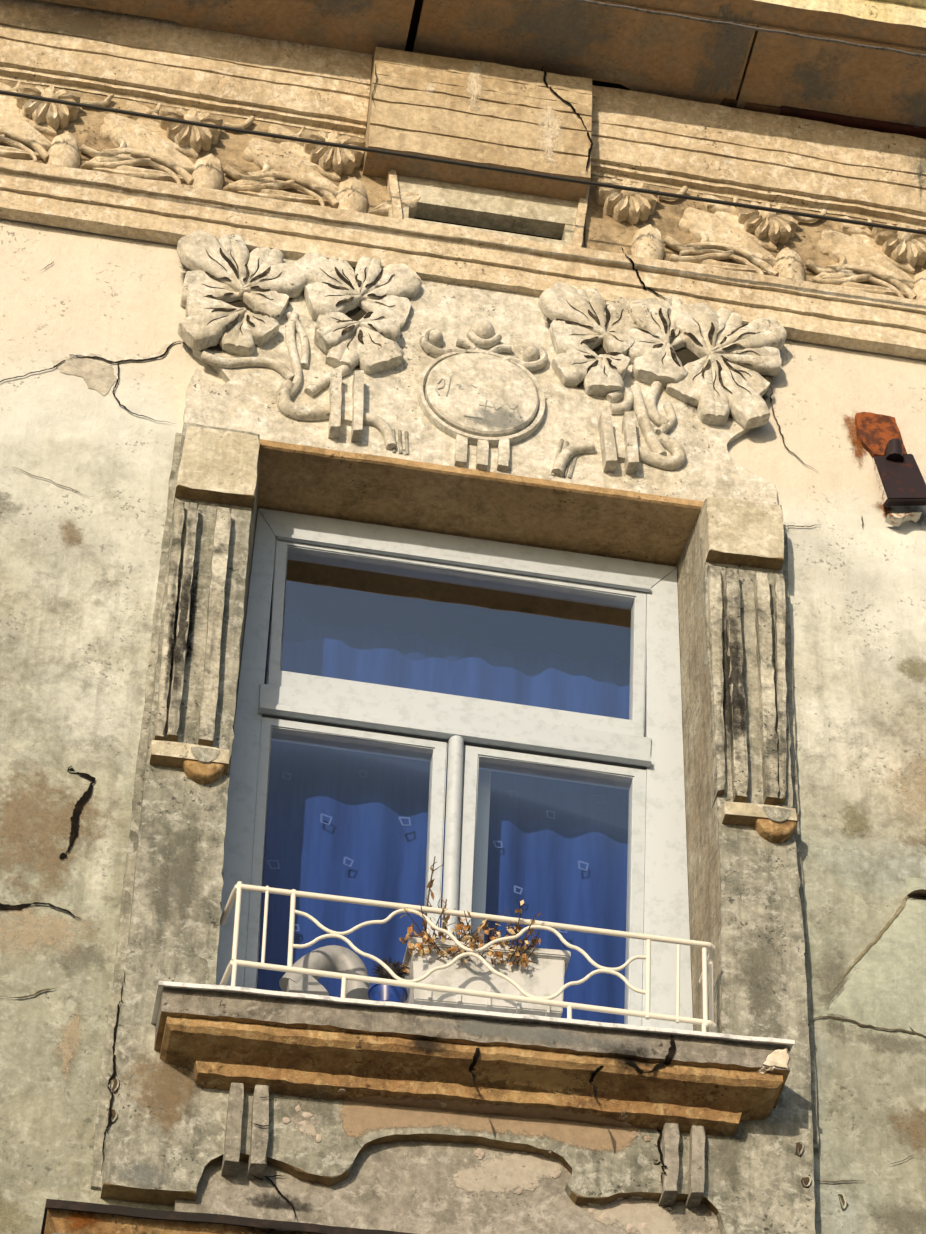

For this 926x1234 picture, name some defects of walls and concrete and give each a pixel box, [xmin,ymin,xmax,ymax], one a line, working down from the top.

crack [541,66,593,172]
crack [0,340,184,424]
rust [845,417,866,458]
damp [165,569,198,683]
damp [738,672,746,731]
crack [59,772,96,859]
crack [0,902,83,920]
crack [808,1015,926,1038]
crack [589,1035,676,1098]
flaking render [282,1097,322,1143]
flaking render [338,1089,650,1195]
flaking render [584,1196,704,1234]